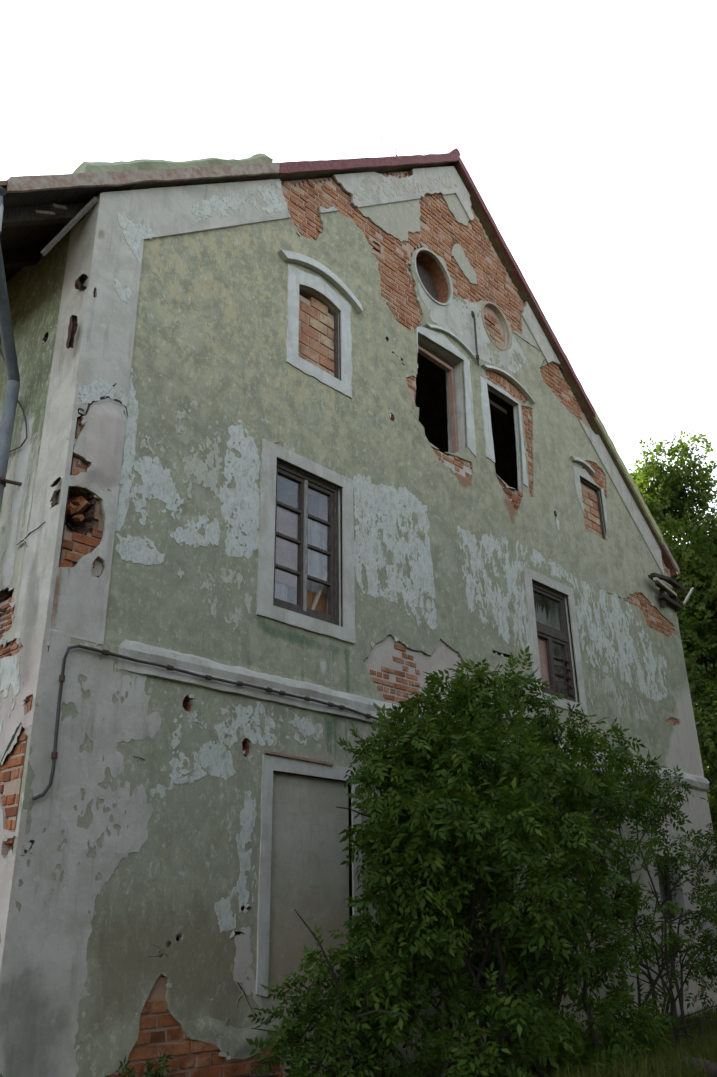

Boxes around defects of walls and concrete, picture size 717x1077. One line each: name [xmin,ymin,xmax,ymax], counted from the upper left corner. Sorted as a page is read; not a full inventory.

spalling [191,178,534,511]
spalling [540,362,592,430]